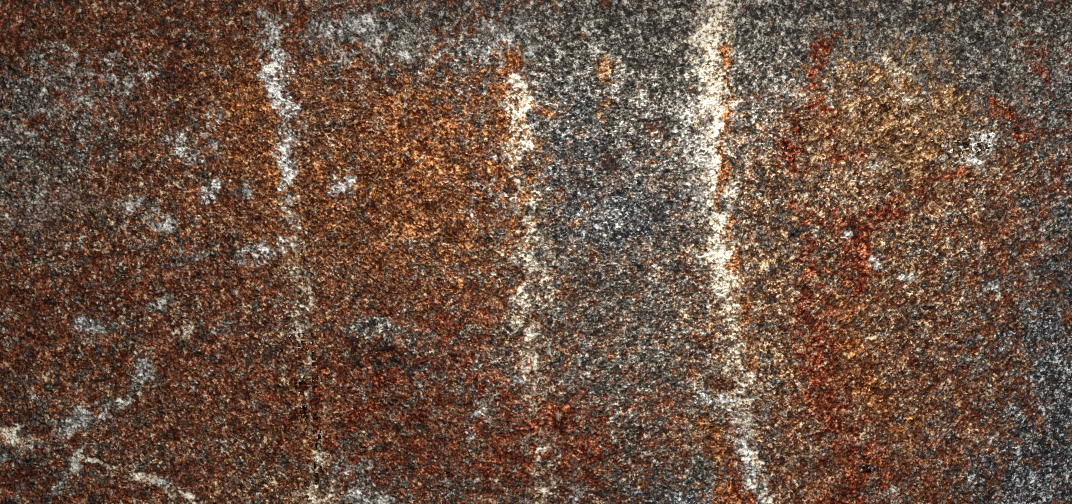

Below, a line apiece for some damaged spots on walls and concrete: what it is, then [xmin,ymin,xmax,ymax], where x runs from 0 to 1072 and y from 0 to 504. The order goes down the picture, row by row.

leakage [233,11,342,504]
leakage [328,175,357,198]
corrosion [194,23,616,502]
leakage [448,2,563,504]
leakage [672,0,774,504]
corrosion [708,10,1044,504]
corrosion [1011,33,1072,138]
corrosion [1049,159,1072,203]